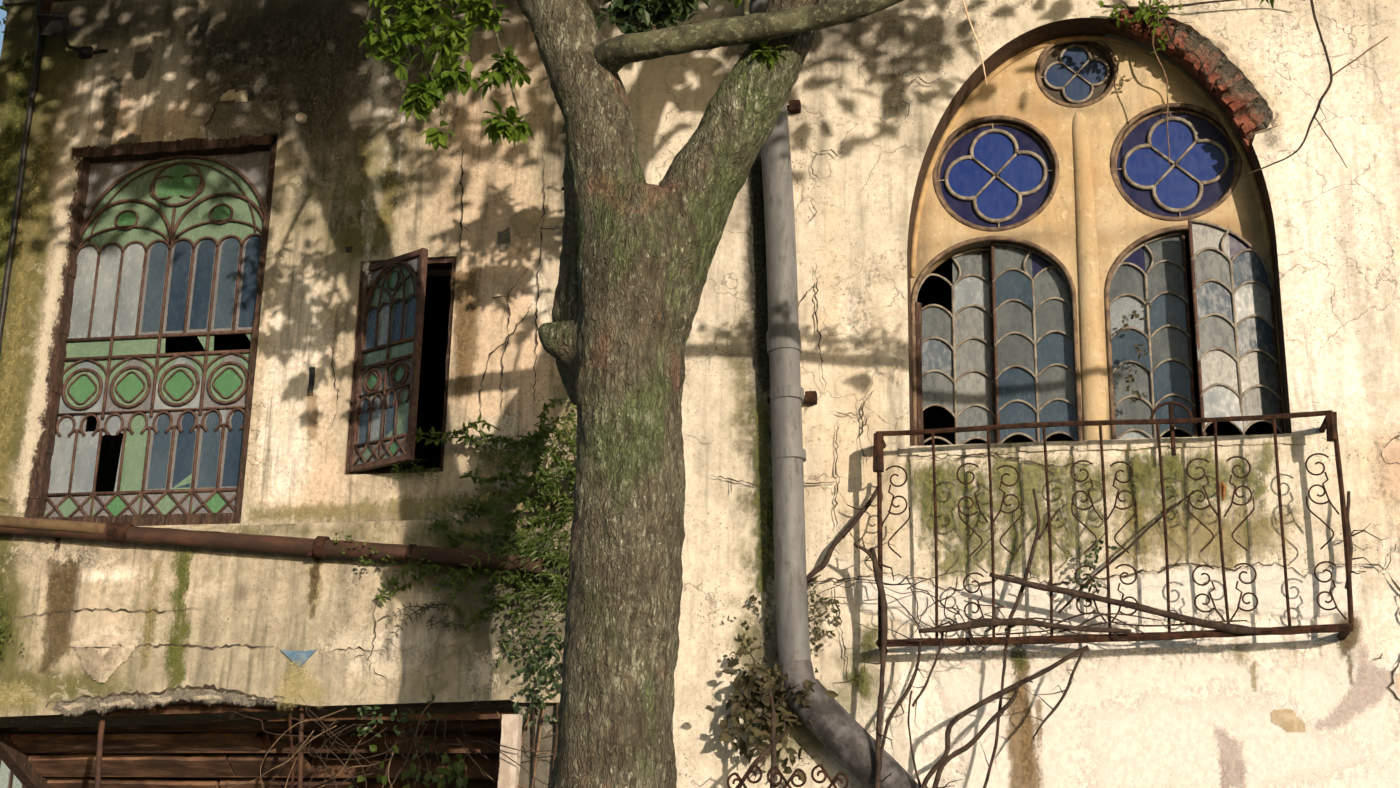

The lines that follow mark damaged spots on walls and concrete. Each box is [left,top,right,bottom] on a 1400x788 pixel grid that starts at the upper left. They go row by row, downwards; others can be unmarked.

flaking render [207,89,283,140]
water stain [194,4,461,280]
crack [807,146,841,220]
flaking render [1106,0,1283,156]
crack [479,145,561,447]
crack [798,263,873,527]
water stain [39,557,79,672]
flaking render [53,635,281,716]